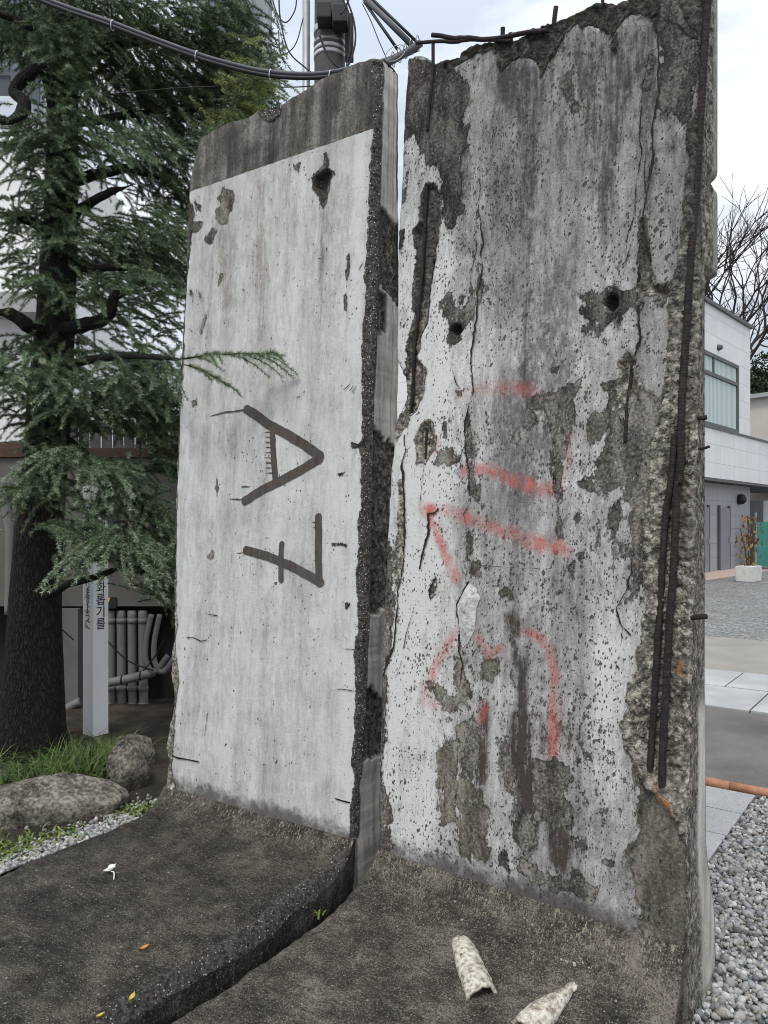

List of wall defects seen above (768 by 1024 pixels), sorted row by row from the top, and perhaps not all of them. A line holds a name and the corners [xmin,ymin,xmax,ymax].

crack [622,13,698,356]
spalling [77,60,384,1024]
crack [382,181,484,677]
water stain [477,703,488,788]
crack [456,565,552,684]
water stain [506,610,571,873]
spalling [394,0,704,946]